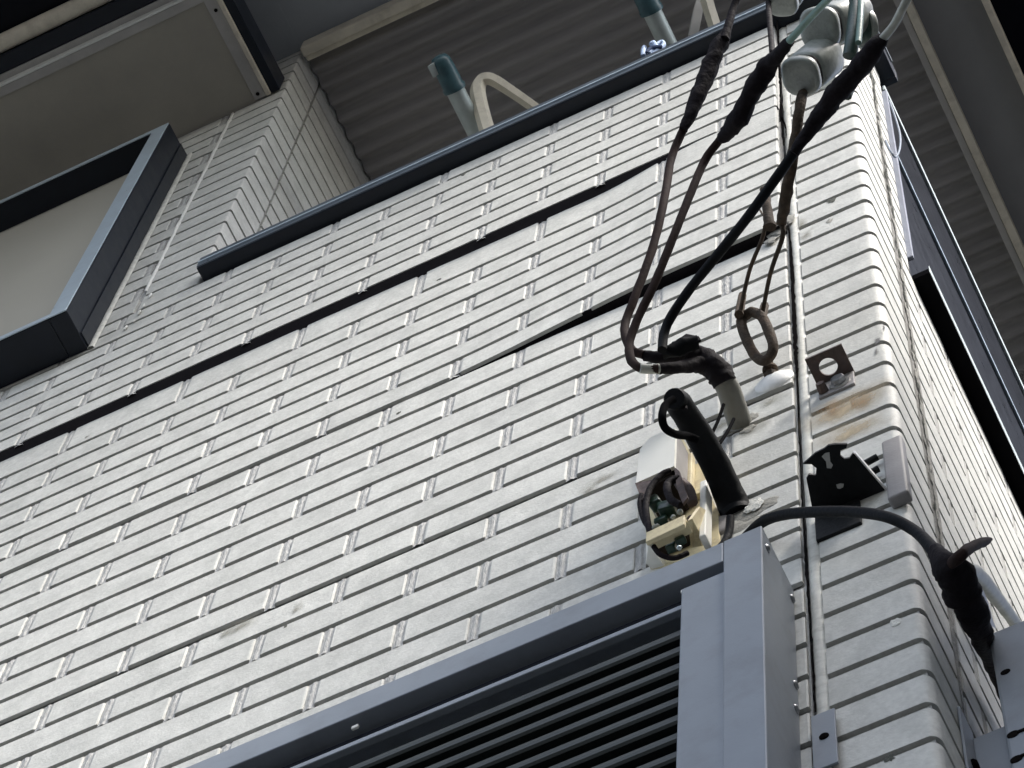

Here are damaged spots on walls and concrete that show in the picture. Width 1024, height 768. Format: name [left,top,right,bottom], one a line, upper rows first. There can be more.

rust [816,389,870,441]